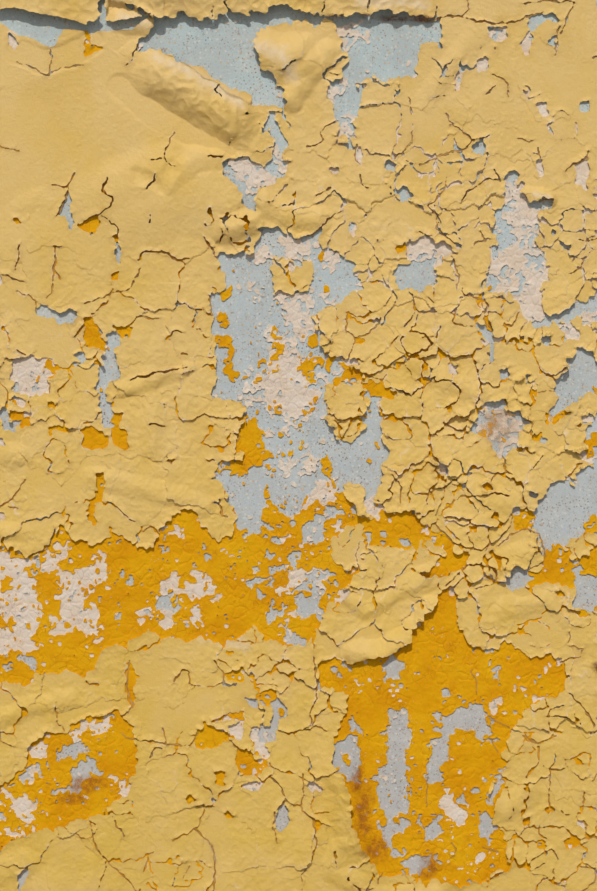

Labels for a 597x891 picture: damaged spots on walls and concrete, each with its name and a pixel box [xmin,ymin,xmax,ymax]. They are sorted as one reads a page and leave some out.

peeling [520,0,575,56]
peeling [0,0,466,211]
peeling [565,151,597,218]
peeling [0,178,159,451]
peeling [203,170,597,614]
crack [120,660,199,747]
crack [174,660,225,687]
peeling [0,463,597,891]
crack [292,645,327,733]
crack [569,693,595,735]
crack [172,804,216,891]
crack [269,773,329,857]